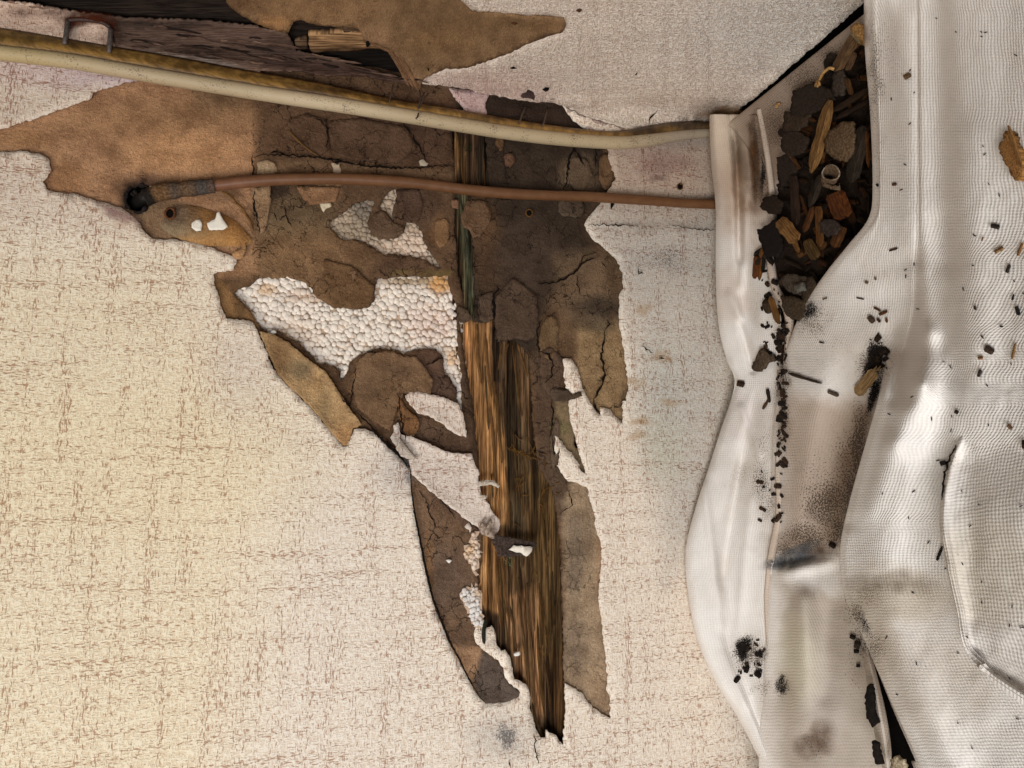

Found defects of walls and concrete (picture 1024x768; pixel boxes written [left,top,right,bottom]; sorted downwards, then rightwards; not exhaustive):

peeling [226,0,624,130]
crack [251,118,454,233]
crack [492,284,500,319]
crack [538,252,606,294]
crack [563,147,597,189]
crack [590,203,639,236]
peeling [0,81,628,718]
crack [536,319,556,468]
crack [593,319,627,414]
crack [342,367,484,701]